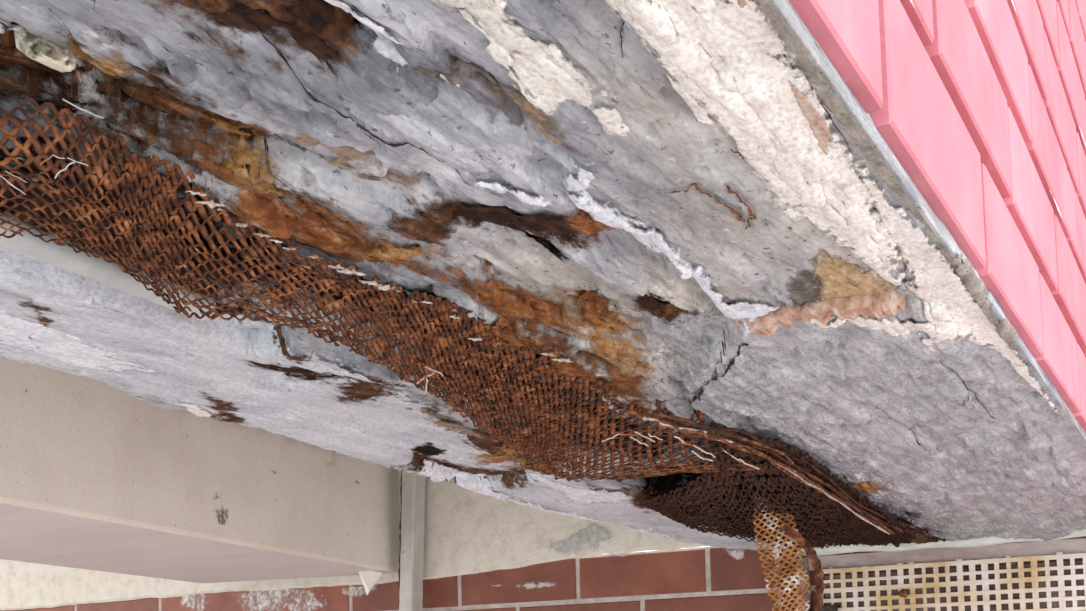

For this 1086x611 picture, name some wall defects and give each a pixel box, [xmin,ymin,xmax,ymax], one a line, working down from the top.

peeling [0,21,86,132]
corrosion [146,0,364,76]
crack [260,30,504,198]
corrosion [0,22,739,476]
peeling [325,0,1077,436]
peeling [0,245,779,550]
crack [683,330,748,419]
corrosion [681,472,854,551]
corrosion [849,481,954,547]
water stain [181,594,208,611]